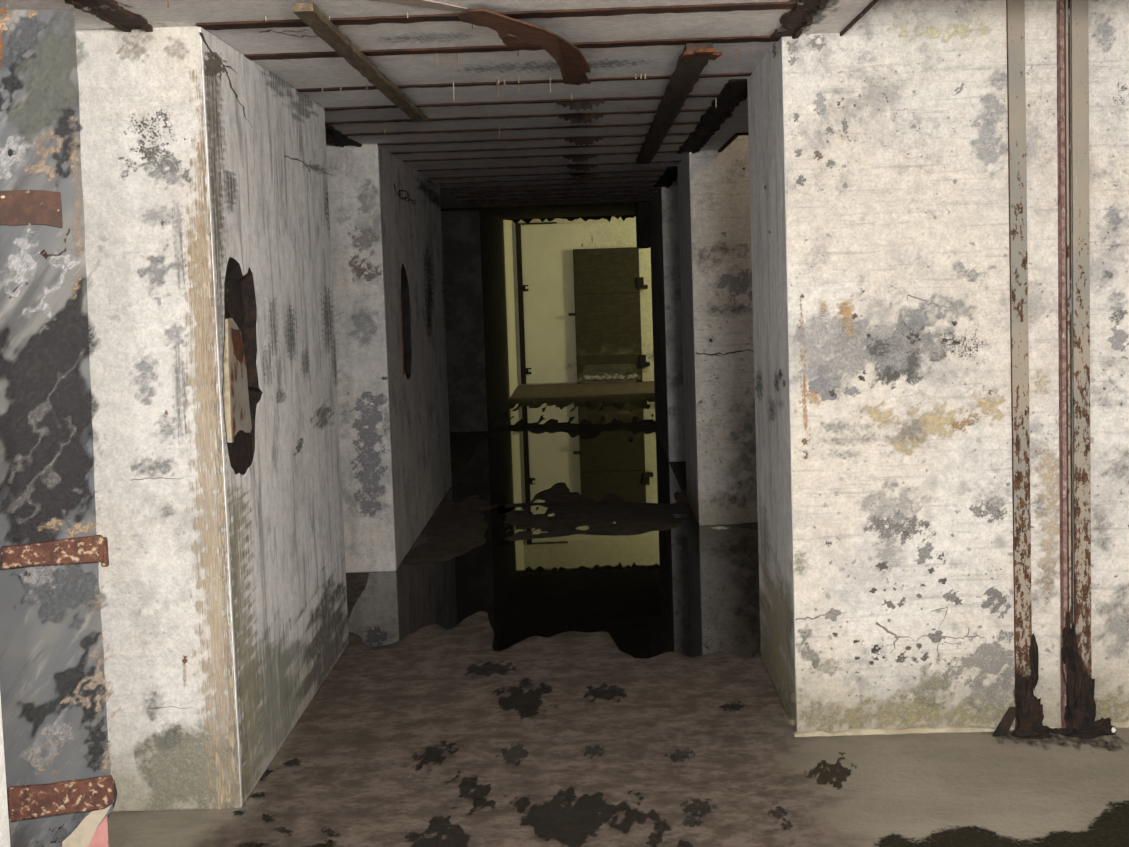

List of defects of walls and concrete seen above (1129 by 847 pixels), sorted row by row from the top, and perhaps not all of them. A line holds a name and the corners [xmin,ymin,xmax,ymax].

spalling [222,257,263,475]
corrosion [1034,452,1060,590]
crack [795,608,847,622]
crack [876,607,985,665]